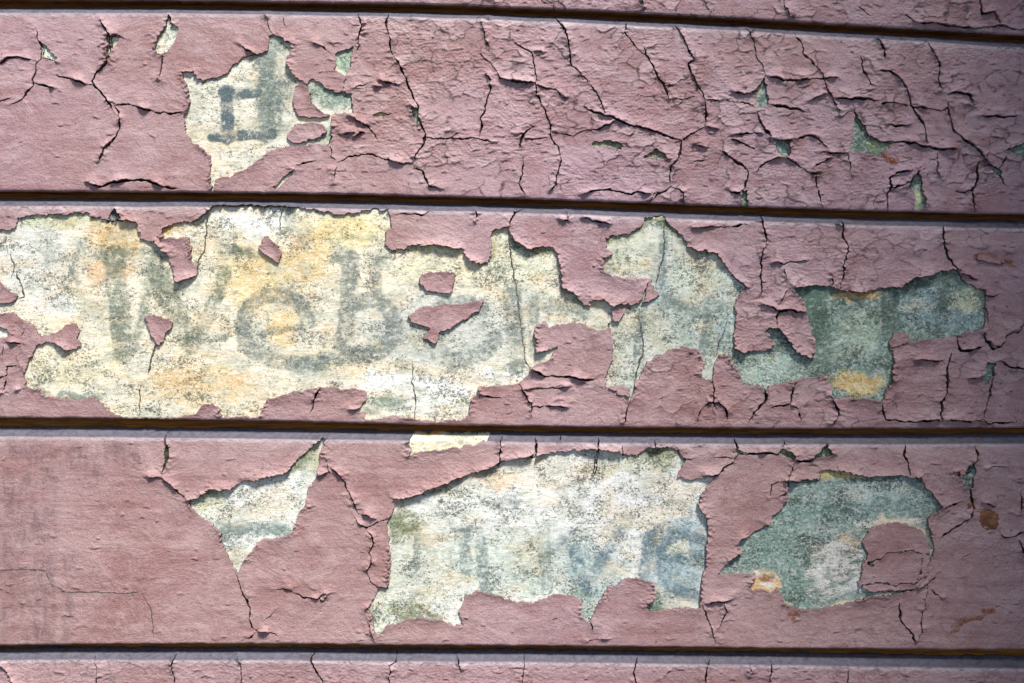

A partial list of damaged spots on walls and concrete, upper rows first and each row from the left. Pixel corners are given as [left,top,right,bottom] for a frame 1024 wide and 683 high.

crack [0,24,180,159]
crack [93,179,176,190]
peeling [183,35,354,191]
crack [297,14,1015,419]
peeling [0,205,986,457]
crack [882,332,1023,425]
crack [155,435,184,497]
peeling [189,438,325,574]
crack [237,572,325,639]
peeling [367,445,714,634]
peeling [718,445,941,610]
crack [866,450,999,640]